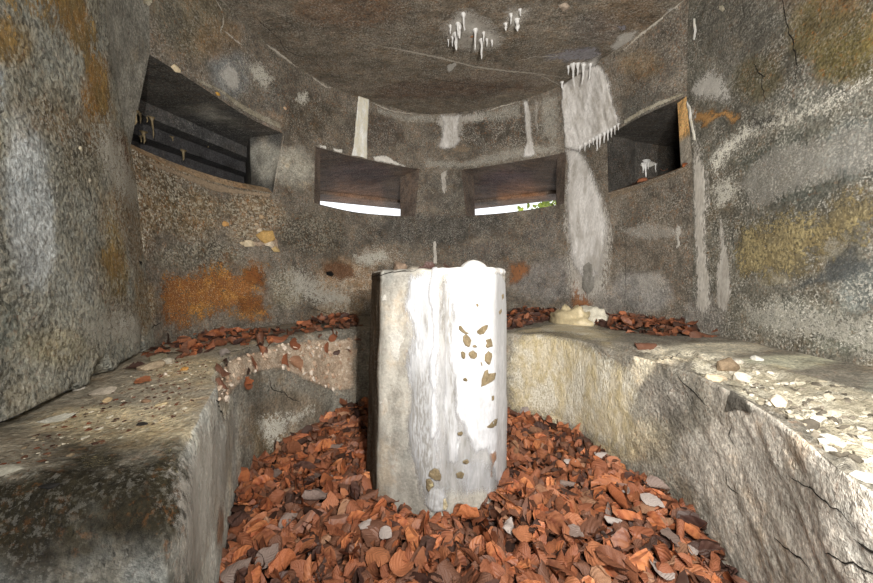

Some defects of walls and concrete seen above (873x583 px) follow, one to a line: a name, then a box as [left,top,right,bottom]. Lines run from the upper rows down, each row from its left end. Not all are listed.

corrosion [0,0,111,120]
crack [782,0,797,79]
water stain [436,113,483,134]
corrosion [693,110,739,128]
water stain [563,149,613,303]
water stain [708,69,873,311]
corrosion [157,252,273,333]
water stain [388,241,507,512]
crack [784,469,873,574]